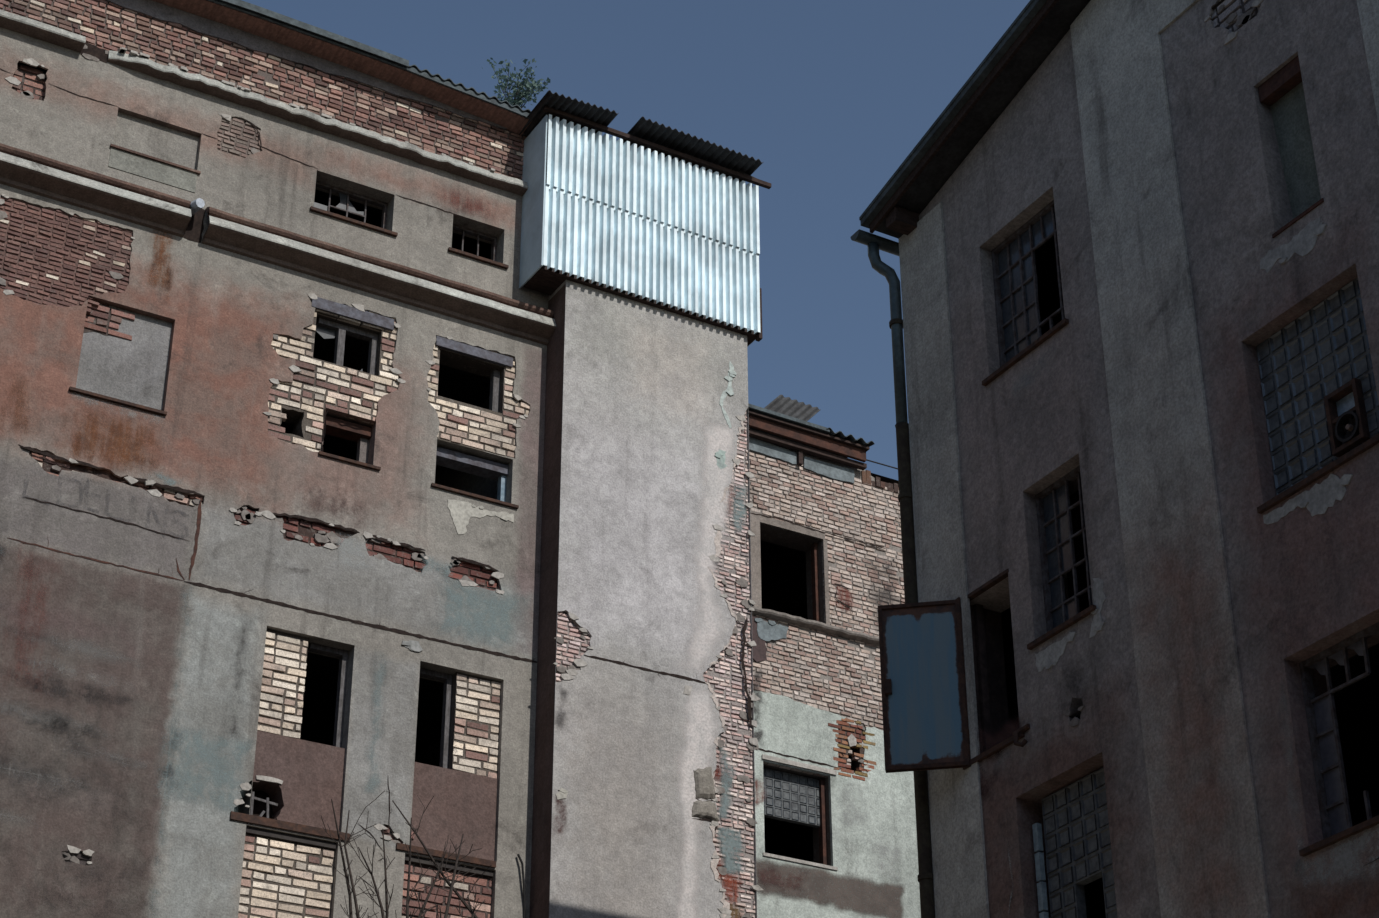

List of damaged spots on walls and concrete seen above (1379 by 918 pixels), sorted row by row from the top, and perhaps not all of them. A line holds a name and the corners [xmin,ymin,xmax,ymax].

flaking render [1204,0,1263,45]
flaking render [5,58,44,86]
flaking render [217,113,261,158]
flaking render [0,194,135,341]
flaking render [263,293,406,452]
flaking render [426,336,530,458]
flaking render [21,448,203,507]
flaking render [1263,473,1353,524]
flaking render [229,506,429,572]
flaking render [448,558,504,595]
flaking render [553,612,593,682]
flaking render [703,362,789,918]